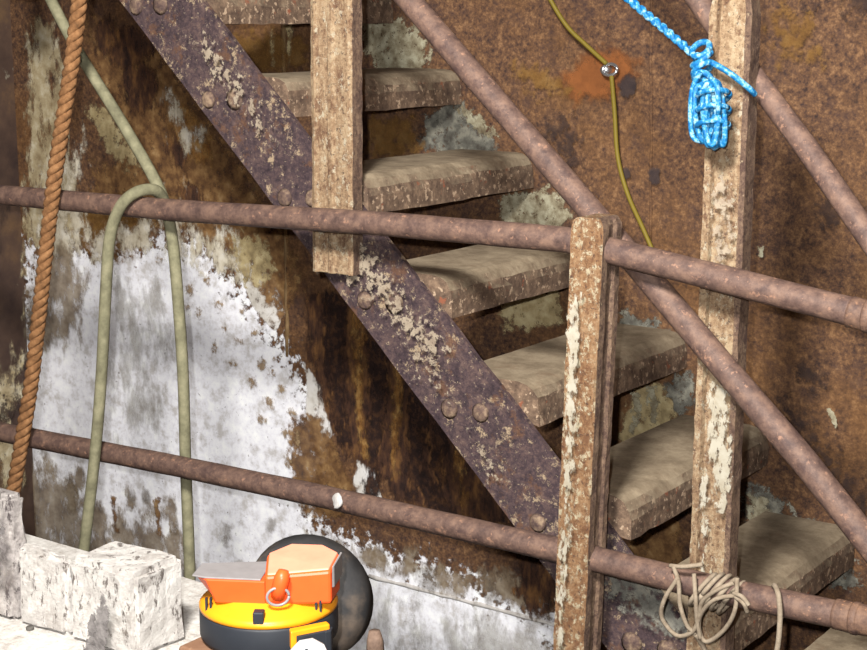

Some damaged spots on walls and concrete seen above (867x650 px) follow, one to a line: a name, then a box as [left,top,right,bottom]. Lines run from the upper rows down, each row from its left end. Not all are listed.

rust [86,12,261,204]
rust [512,50,641,103]
peeling [32,210,104,439]
rust [72,213,110,253]
peeling [102,218,180,456]
peeling [175,221,332,478]
rust [177,222,515,527]
rust [499,290,563,332]
peeling [23,448,89,544]
peeling [91,462,184,577]
peeling [192,292,582,650]
rust [351,546,556,621]